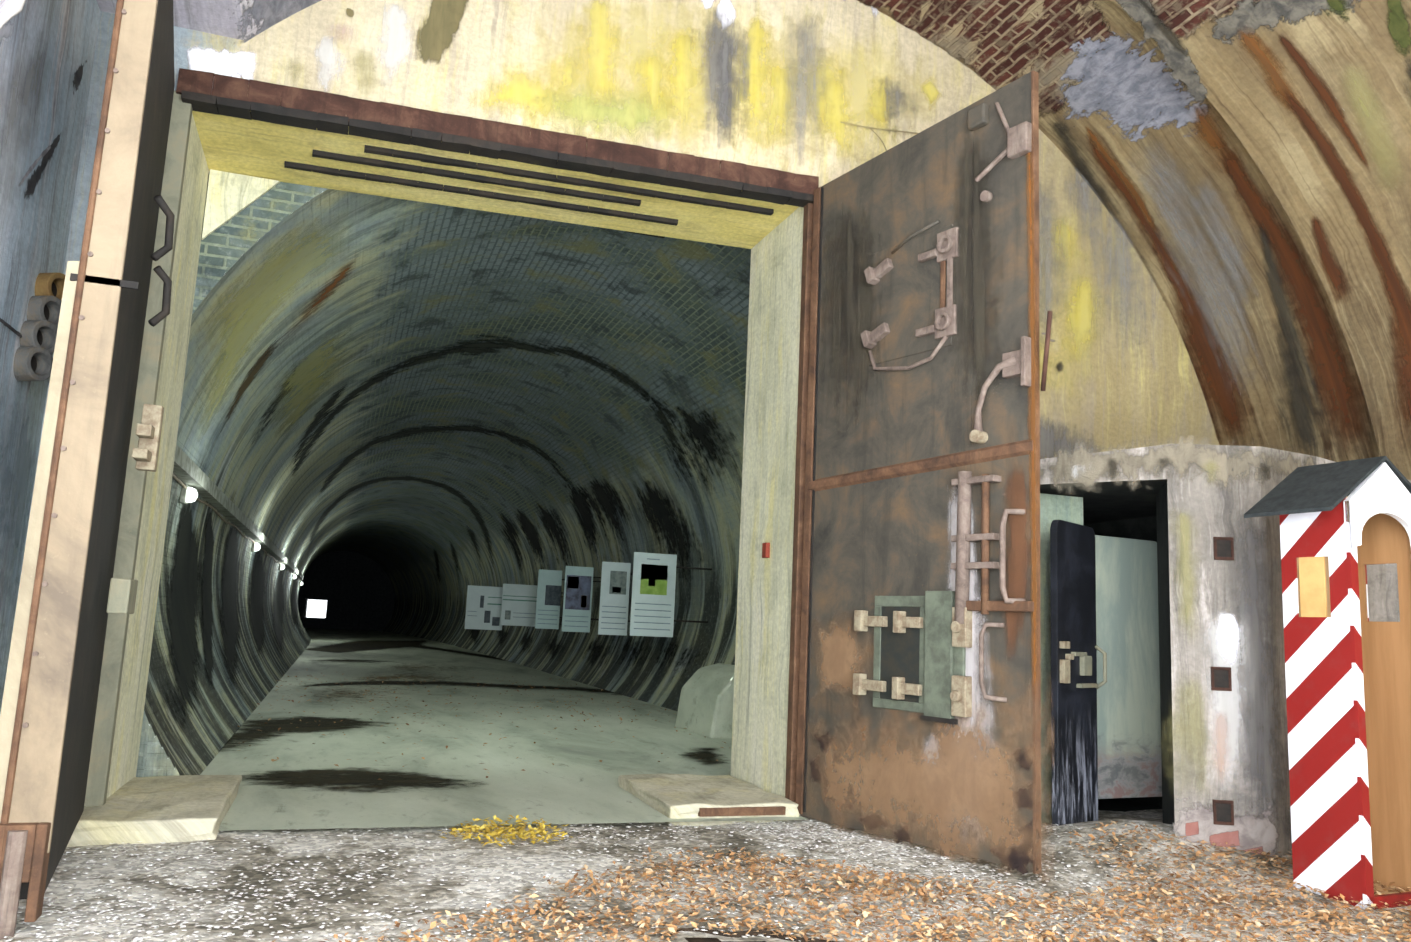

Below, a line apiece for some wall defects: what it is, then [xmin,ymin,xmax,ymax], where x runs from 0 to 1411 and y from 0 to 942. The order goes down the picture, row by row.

peeling [0,22,13,43]
peeling [187,0,321,95]
peeling [319,8,354,87]
leakage [588,1,617,102]
leakage [635,0,848,147]
leakage [871,87,904,121]
flaking render [860,0,1209,142]
spalling [1149,0,1361,44]
corrosion [1054,123,1254,445]
corrosion [1196,109,1370,452]
corrosion [1240,32,1411,421]
corrosion [815,621,1053,861]